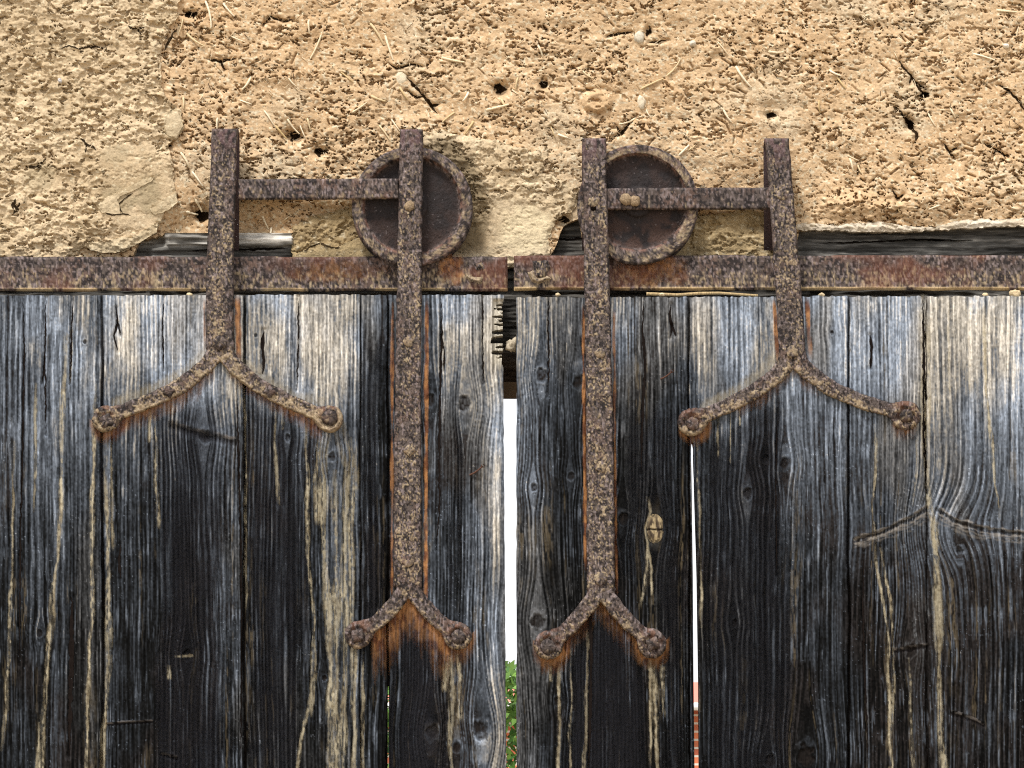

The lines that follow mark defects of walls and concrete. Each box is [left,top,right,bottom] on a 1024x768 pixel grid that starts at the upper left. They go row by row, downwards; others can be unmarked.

crack [390,64,439,114]
crack [899,61,927,94]
flaking render [0,0,197,257]
crack [895,107,918,143]